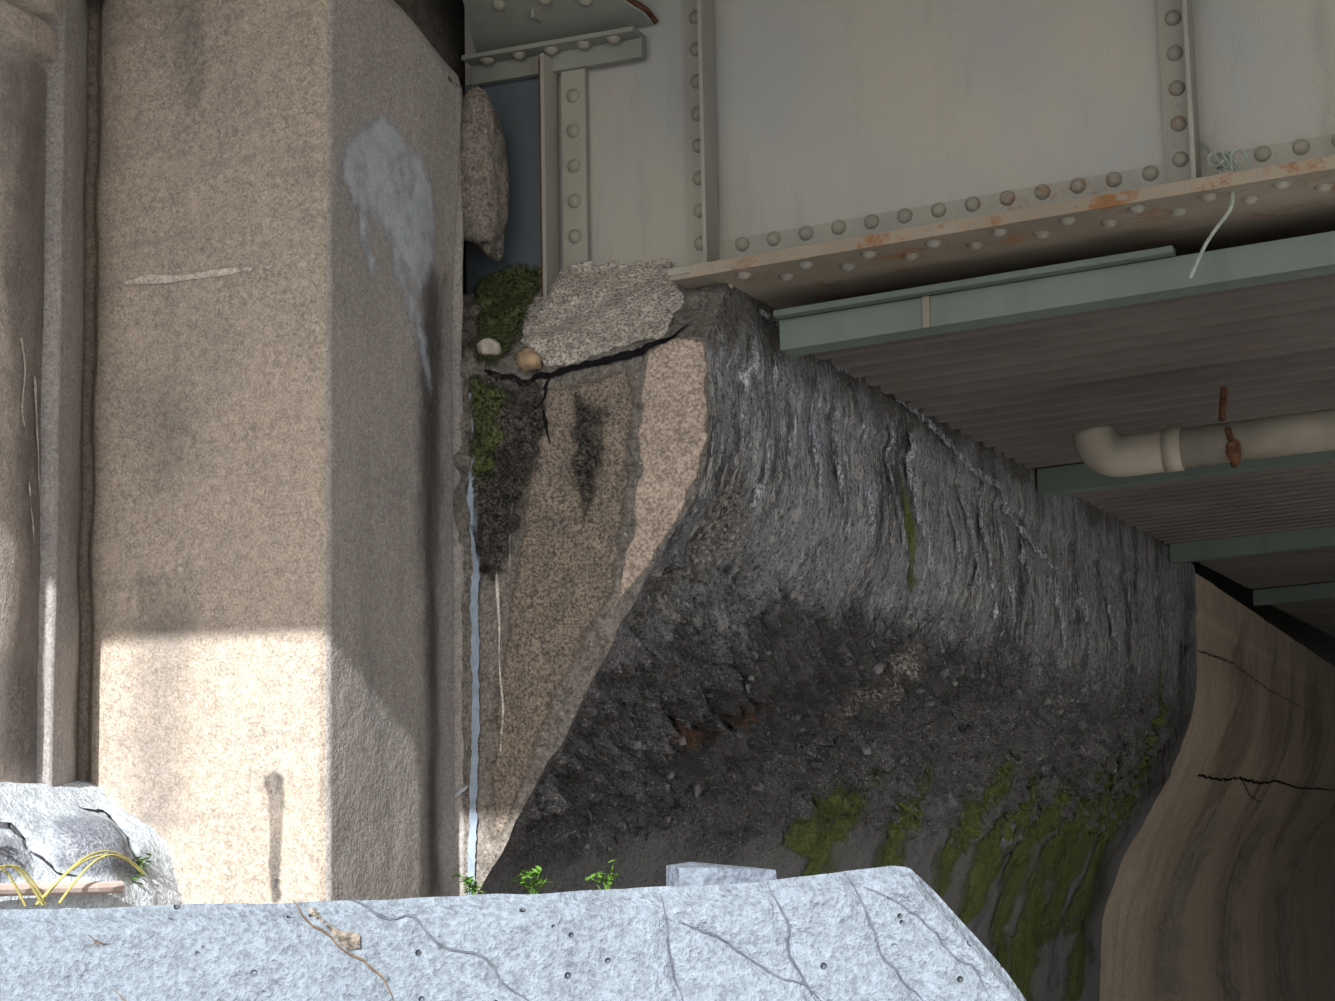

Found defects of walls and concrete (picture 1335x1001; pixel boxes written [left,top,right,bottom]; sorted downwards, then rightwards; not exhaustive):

corrosion [626,0,658,24]
corrosion [689,155,1335,278]
crack [484,322,691,444]
damp [343,115,440,717]
crack [1198,651,1315,714]
damp [429,748,438,886]
crack [1197,774,1335,803]
damp [269,854,279,901]
damp [966,903,993,937]